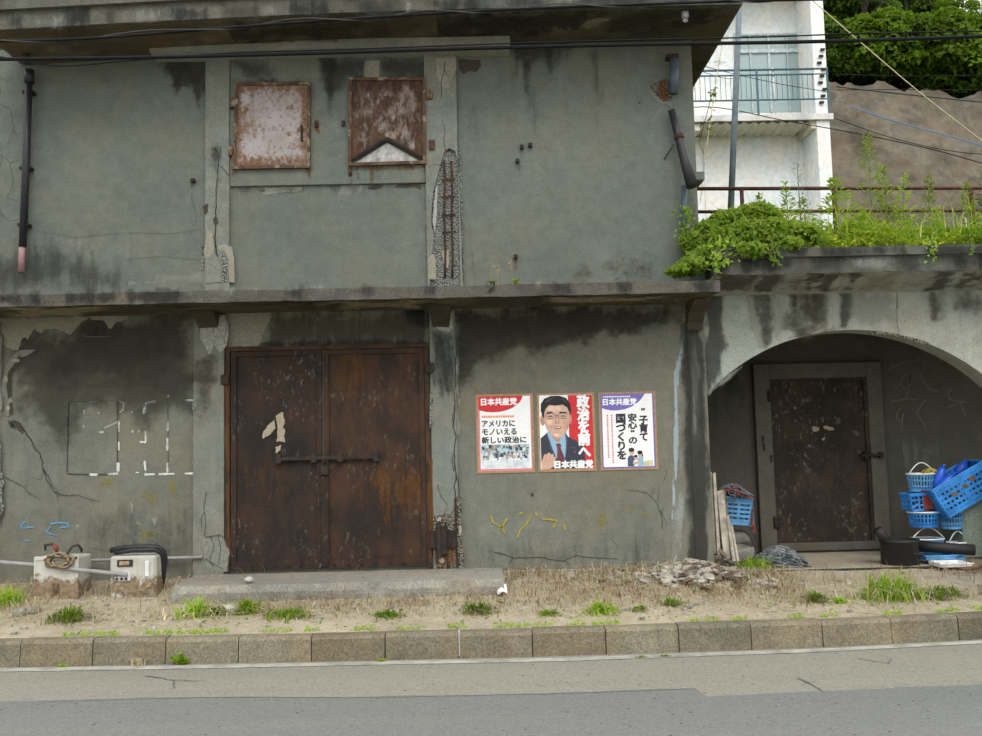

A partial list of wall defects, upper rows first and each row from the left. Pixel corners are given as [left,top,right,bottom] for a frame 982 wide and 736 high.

spalling [368,148,464,286]
water stain [909,246,982,319]
peeling [0,316,129,416]
water stain [0,288,213,432]
crack [8,424,100,502]